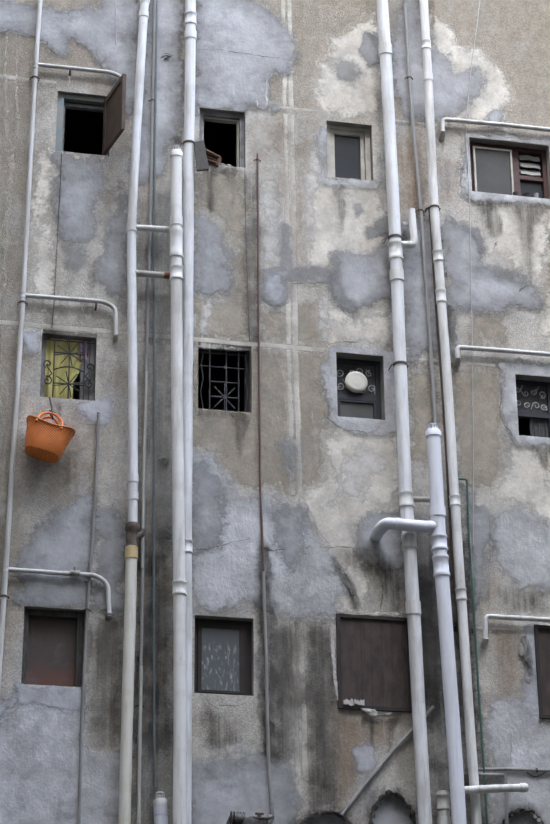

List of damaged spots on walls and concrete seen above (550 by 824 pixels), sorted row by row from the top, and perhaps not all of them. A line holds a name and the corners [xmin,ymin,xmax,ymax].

water stain [335,59,363,82]
water stain [305,148,322,249]
water stain [365,215,389,238]
water stain [448,201,550,253]
water stain [193,168,355,497]
water stain [256,545,338,807]
spalling [294,810,352,824]
spalling [367,788,417,824]
spalling [502,807,544,824]